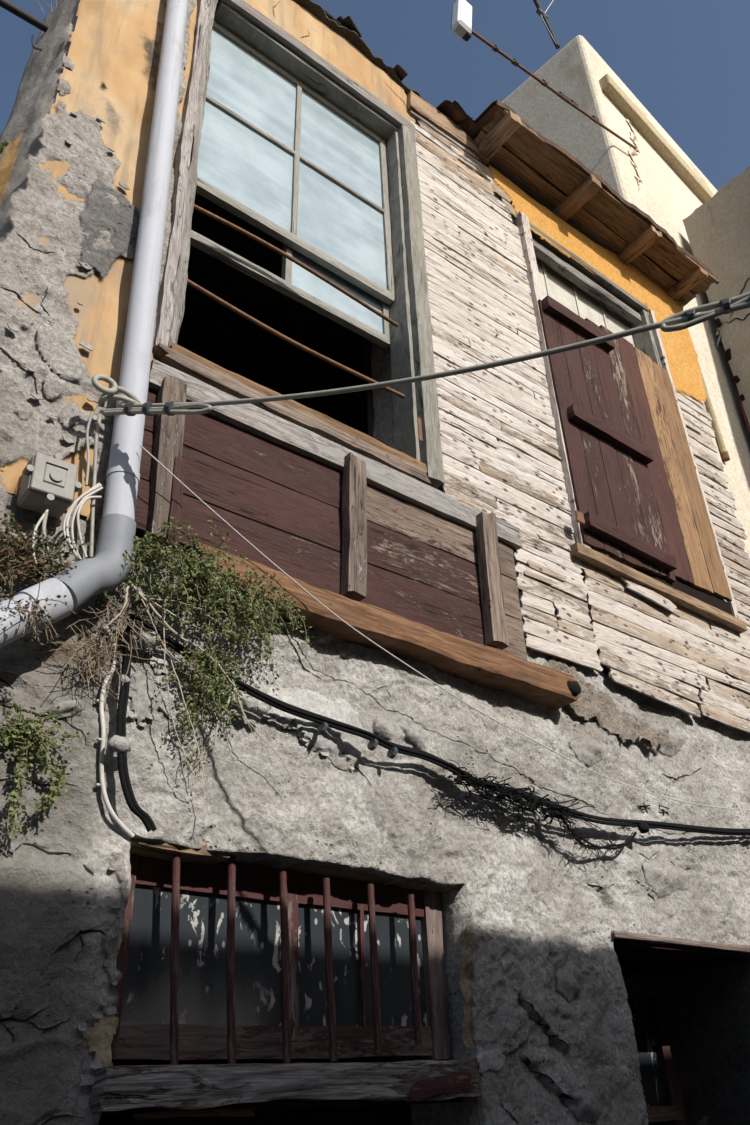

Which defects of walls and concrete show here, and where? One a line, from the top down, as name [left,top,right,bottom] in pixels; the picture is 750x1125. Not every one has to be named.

spalling [0,54,141,602]
crack [715,275,750,347]
spalling [72,594,98,613]
spalling [543,655,669,755]
crack [50,925,107,959]
spalling [77,855,128,1093]
crack [0,1005,71,1044]
crack [514,989,571,1054]
crack [517,1052,578,1102]